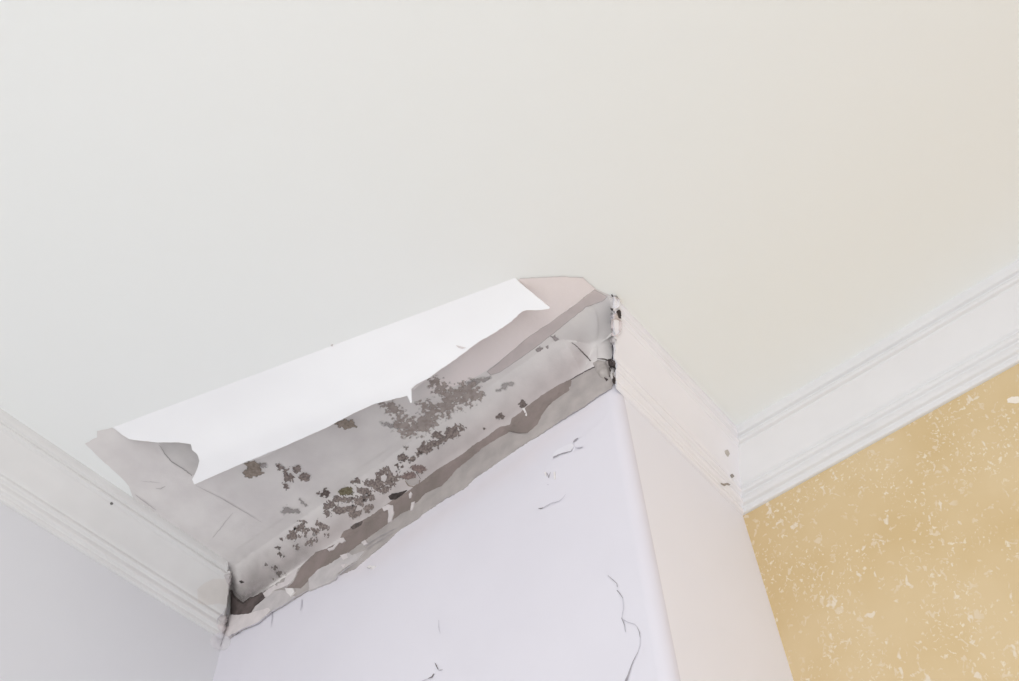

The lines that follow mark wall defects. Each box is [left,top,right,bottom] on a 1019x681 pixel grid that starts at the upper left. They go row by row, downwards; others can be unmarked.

flaking render [85,276,622,639]
water stain [379,377,513,438]
water stain [318,389,614,594]
crack [610,577,640,681]